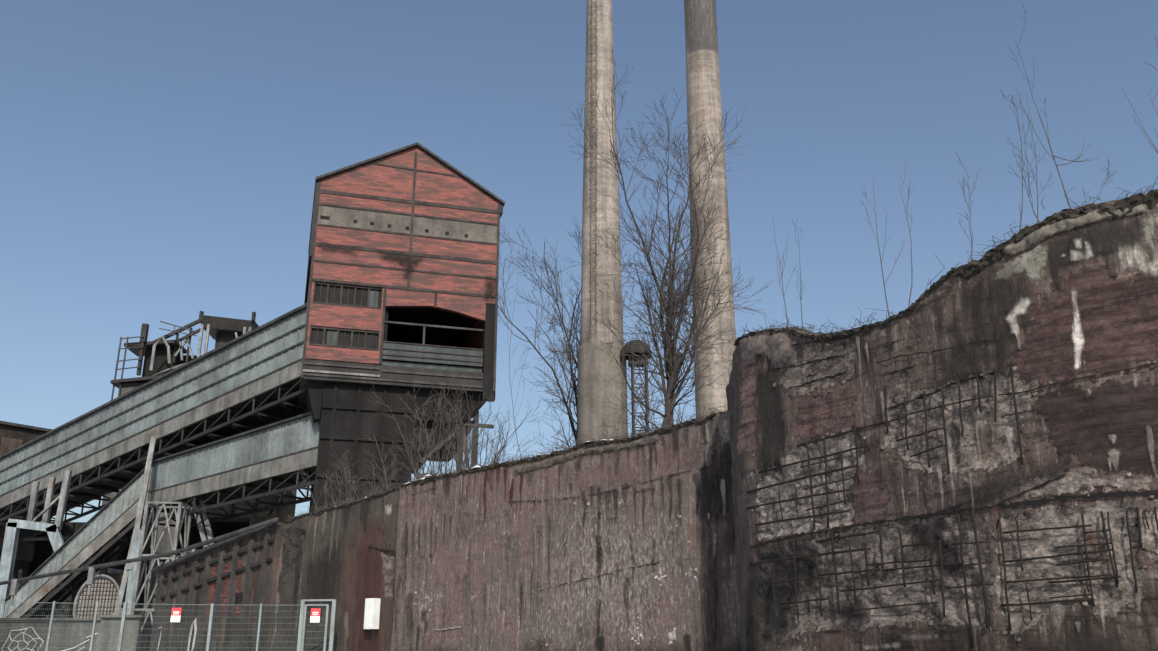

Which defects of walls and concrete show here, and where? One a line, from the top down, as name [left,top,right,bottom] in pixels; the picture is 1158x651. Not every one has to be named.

leakage [941,276,1029,381]
leakage [1048,217,1156,368]
leakage [649,426,686,466]
spalling [701,214,1158,651]
leakage [503,586,523,634]
leakage [558,484,627,651]
leakage [667,422,735,649]
leakage [735,541,816,651]